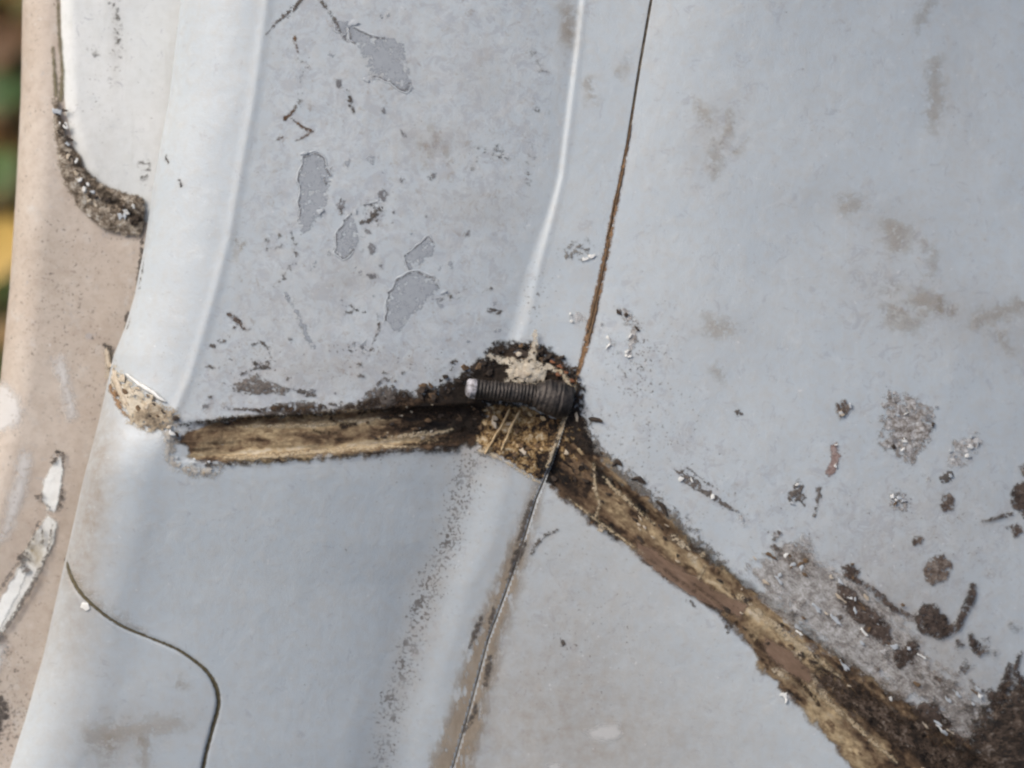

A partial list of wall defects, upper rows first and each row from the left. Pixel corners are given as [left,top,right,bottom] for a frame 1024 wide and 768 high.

peeling [332,20,414,94]
peeling [296,150,394,279]
peeling [105,347,179,437]
corrosion [174,125,1024,768]
peeling [788,480,822,517]
peeling [826,443,841,477]
peeling [878,391,938,464]
peeling [927,432,982,511]
peeling [985,465,1024,538]
peeling [0,450,65,662]
peeling [842,563,860,580]
peeling [923,555,952,585]